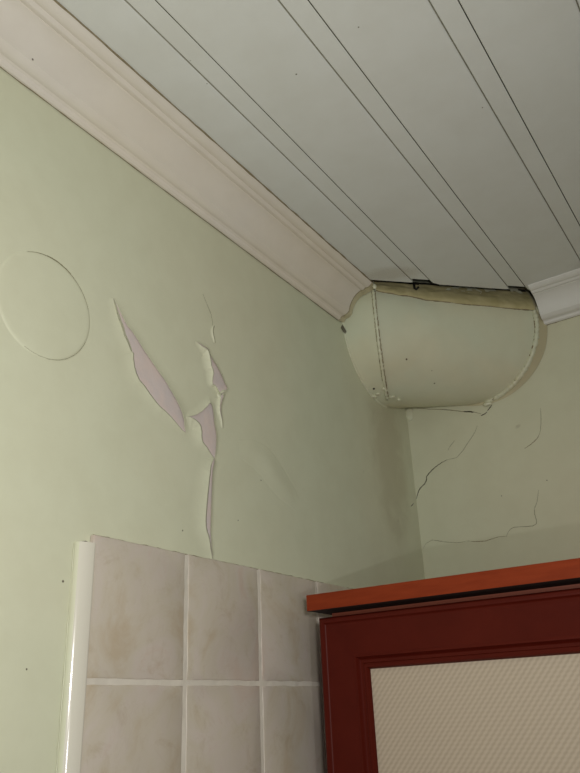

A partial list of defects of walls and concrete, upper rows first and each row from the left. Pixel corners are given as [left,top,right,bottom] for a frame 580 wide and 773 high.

peeling [186,338,230,559]
crack [411,405,492,506]